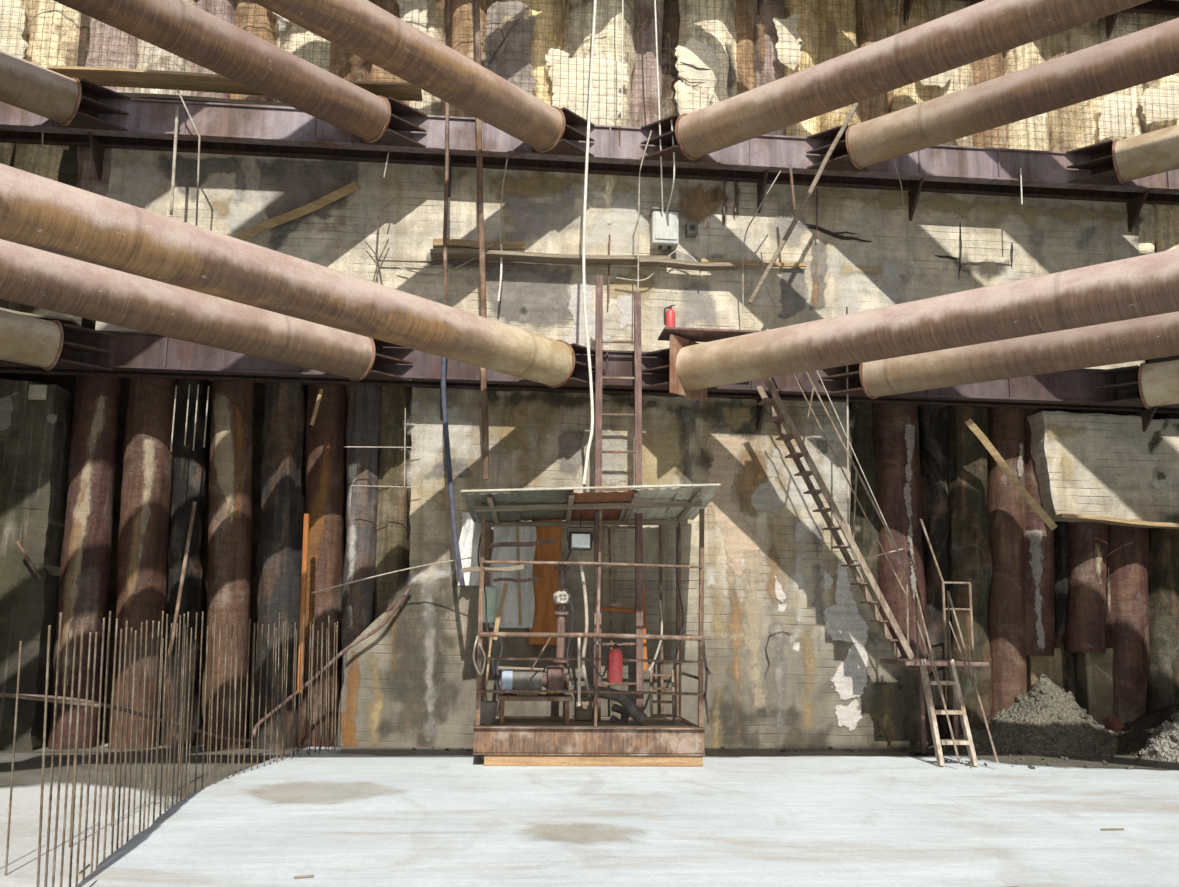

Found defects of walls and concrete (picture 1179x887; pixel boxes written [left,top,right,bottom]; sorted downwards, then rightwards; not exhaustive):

spalling [484,1,537,95]
water stain [107,156,358,249]
crack [806,224,872,242]
water stain [0,392,18,431]
water stain [406,401,477,504]
corrosion [735,452,767,516]
water stain [369,565,460,746]